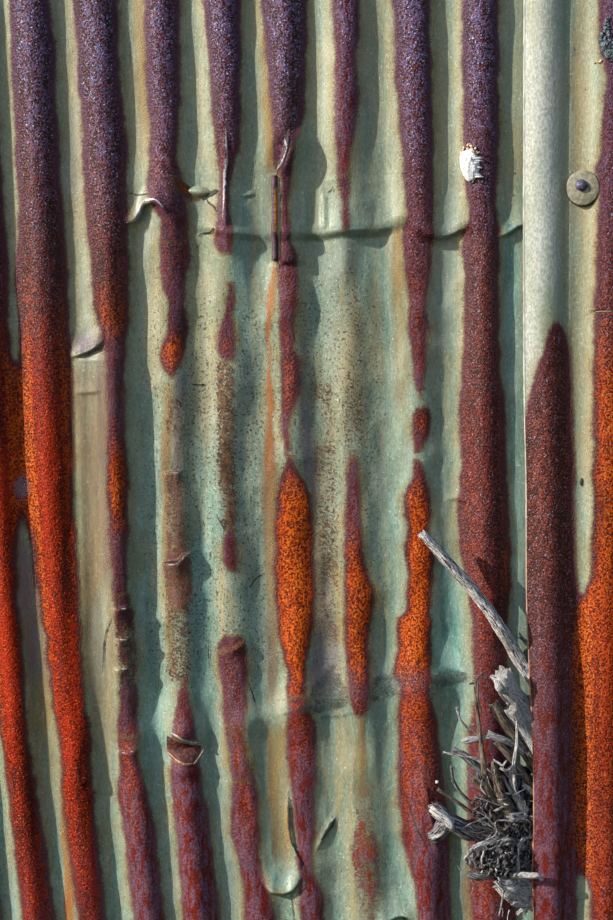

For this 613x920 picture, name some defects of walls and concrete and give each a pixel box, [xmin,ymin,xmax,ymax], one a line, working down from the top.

corrosion [0,0,108,920]
corrosion [70,0,166,920]
corrosion [138,0,200,380]
corrosion [165,752,223,920]
corrosion [201,0,245,255]
corrosion [214,276,239,572]
corrosion [214,608,276,920]
corrosion [259,0,380,920]
corrosion [386,0,453,920]
corrosion [455,0,516,628]
corrosion [463,590,511,825]
corrosion [525,0,613,920]